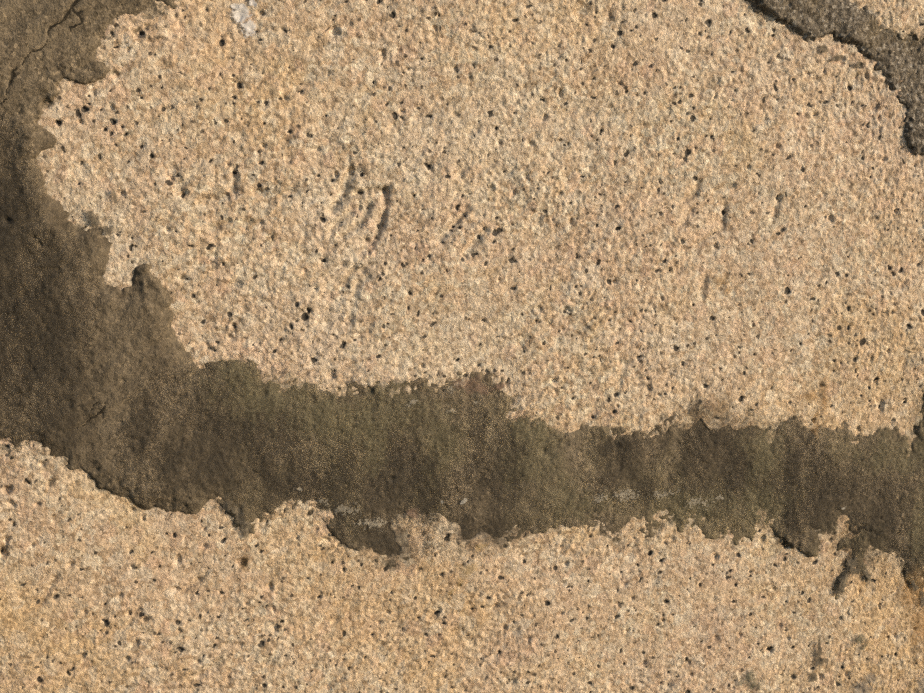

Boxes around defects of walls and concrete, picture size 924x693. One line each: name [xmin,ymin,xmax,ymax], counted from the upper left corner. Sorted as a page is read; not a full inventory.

crack [1,0,83,104]
water stain [319,449,443,555]
water stain [594,441,679,504]